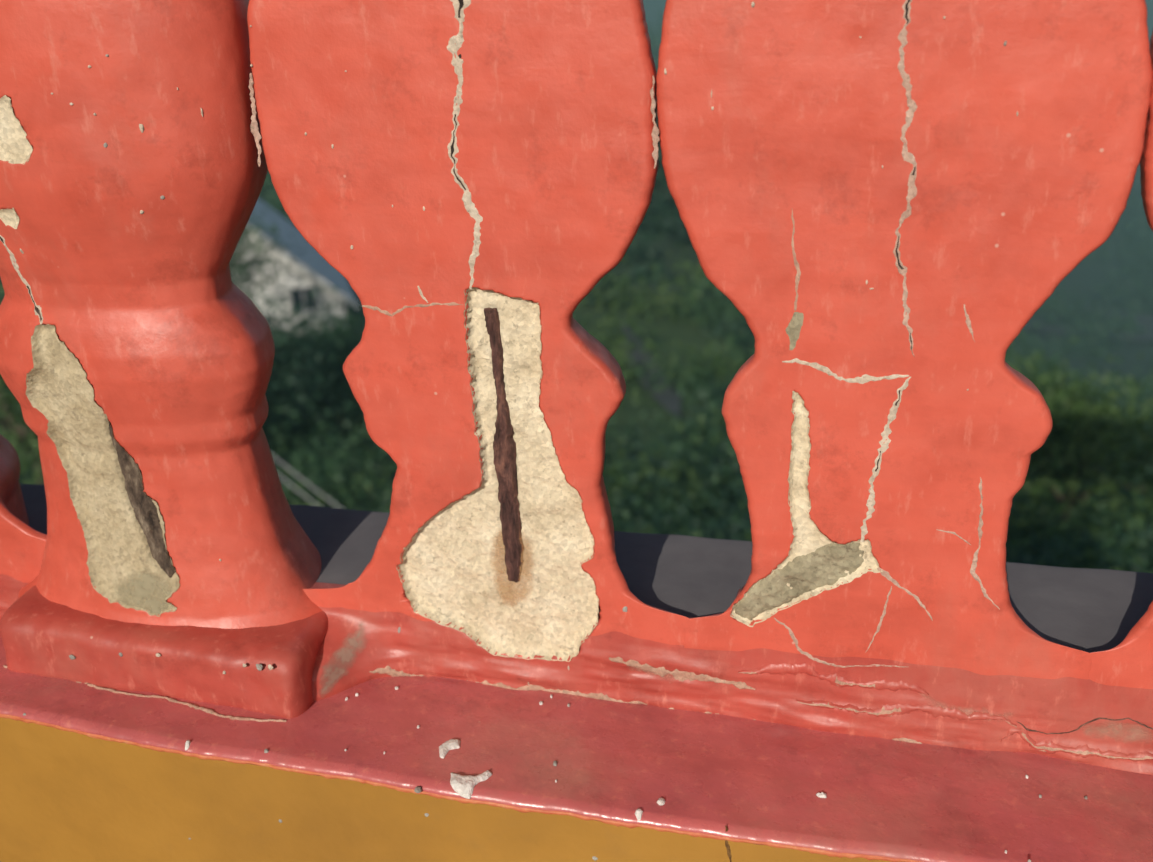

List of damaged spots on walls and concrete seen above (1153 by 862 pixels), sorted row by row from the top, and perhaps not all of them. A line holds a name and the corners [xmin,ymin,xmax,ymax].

peeling [0,208,19,229]
peeling [0,95,33,165]
crack [0,235,43,324]
crack [362,0,483,316]
crack [782,0,918,542]
spalling [26,324,180,617]
spalling [396,287,600,670]
spalling [730,391,883,627]
crack [970,477,1000,610]
crack [774,567,933,668]
crack [76,681,286,722]
crack [1017,717,1153,734]